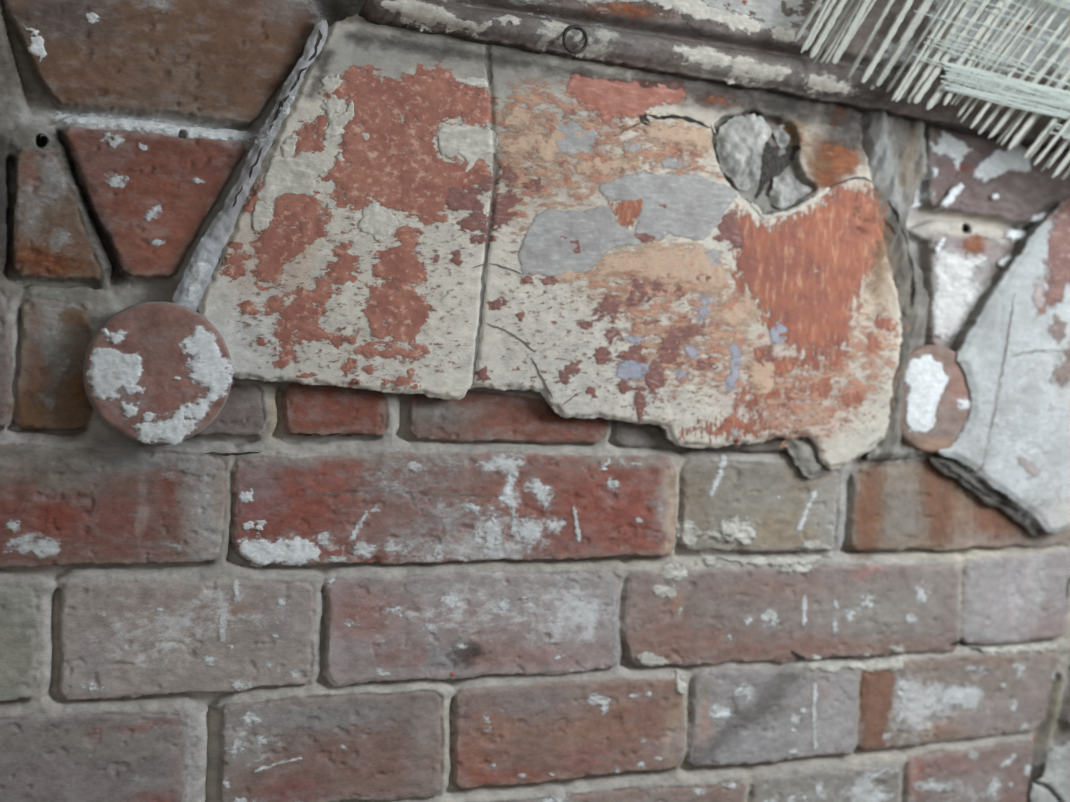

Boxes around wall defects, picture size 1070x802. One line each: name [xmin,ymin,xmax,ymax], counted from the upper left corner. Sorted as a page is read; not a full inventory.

peeling [858,37,926,75]
peeling [926,0,1070,83]
crack [607,112,916,317]
crack [471,153,582,405]
peeling [1032,197,1070,388]
crack [936,295,1070,520]
damp [239,488,254,503]
damp [235,506,425,571]
damp [431,452,581,558]
damp [600,458,641,489]
peeling [1016,455,1041,480]
crack [1029,780,1062,802]